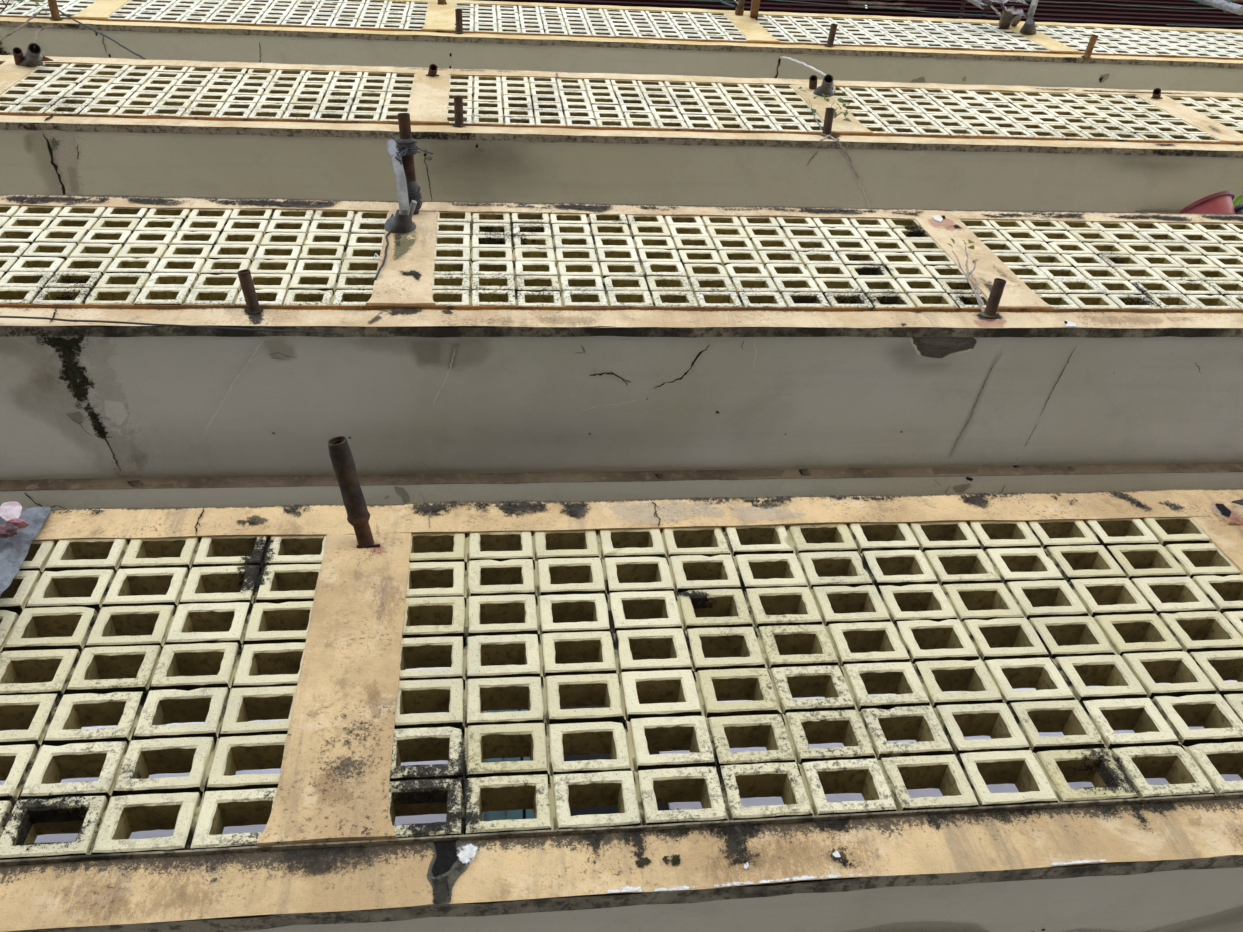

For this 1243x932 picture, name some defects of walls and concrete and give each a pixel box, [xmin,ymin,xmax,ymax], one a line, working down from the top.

crack [43,115,79,195]
crack [35,309,121,471]
crack [578,342,710,412]
spalling [909,337,977,358]
crack [934,353,1003,494]
damp [275,504,317,517]
damp [235,515,283,596]
damp [272,845,379,878]
damp [577,808,767,868]
damp [801,819,859,838]
damp [926,813,953,832]
damp [969,809,1039,823]